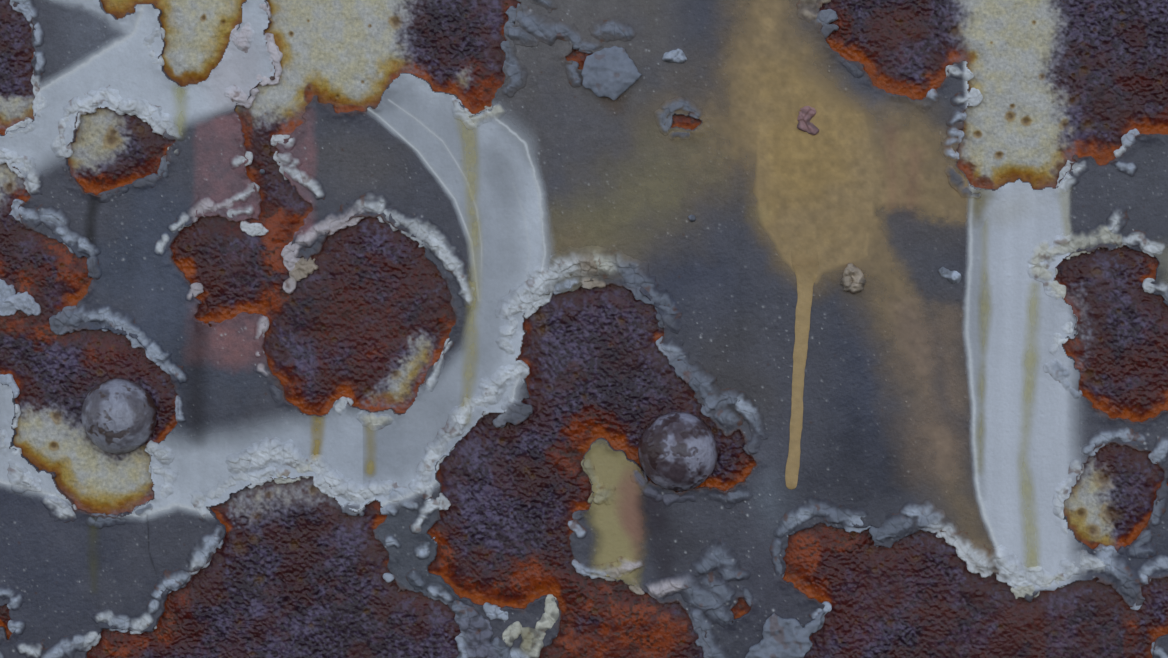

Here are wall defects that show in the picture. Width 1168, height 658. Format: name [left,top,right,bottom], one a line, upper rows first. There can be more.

corrosion [0,0,768,658]
peeling [797,106,819,135]
corrosion [769,206,1168,658]
corrosion [796,0,1168,209]